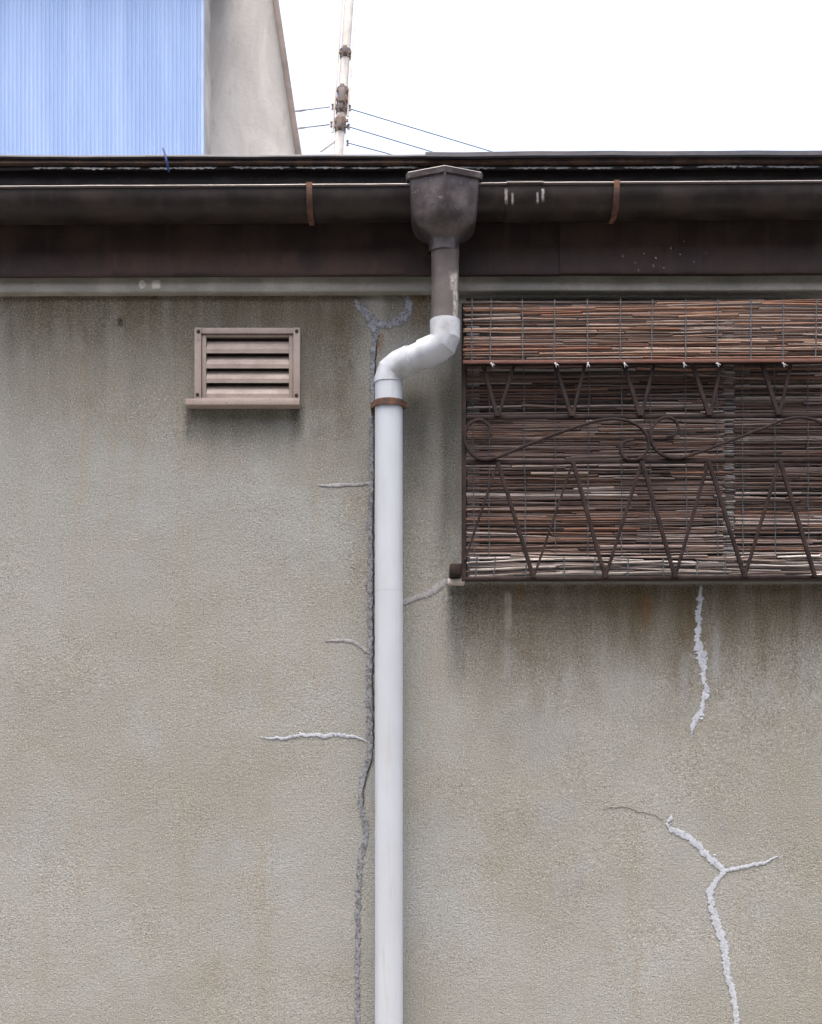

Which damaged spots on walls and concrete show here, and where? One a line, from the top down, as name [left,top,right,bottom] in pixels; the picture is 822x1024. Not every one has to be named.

crack [262,296,414,1024]
crack [690,585,710,737]
crack [603,806,778,1024]